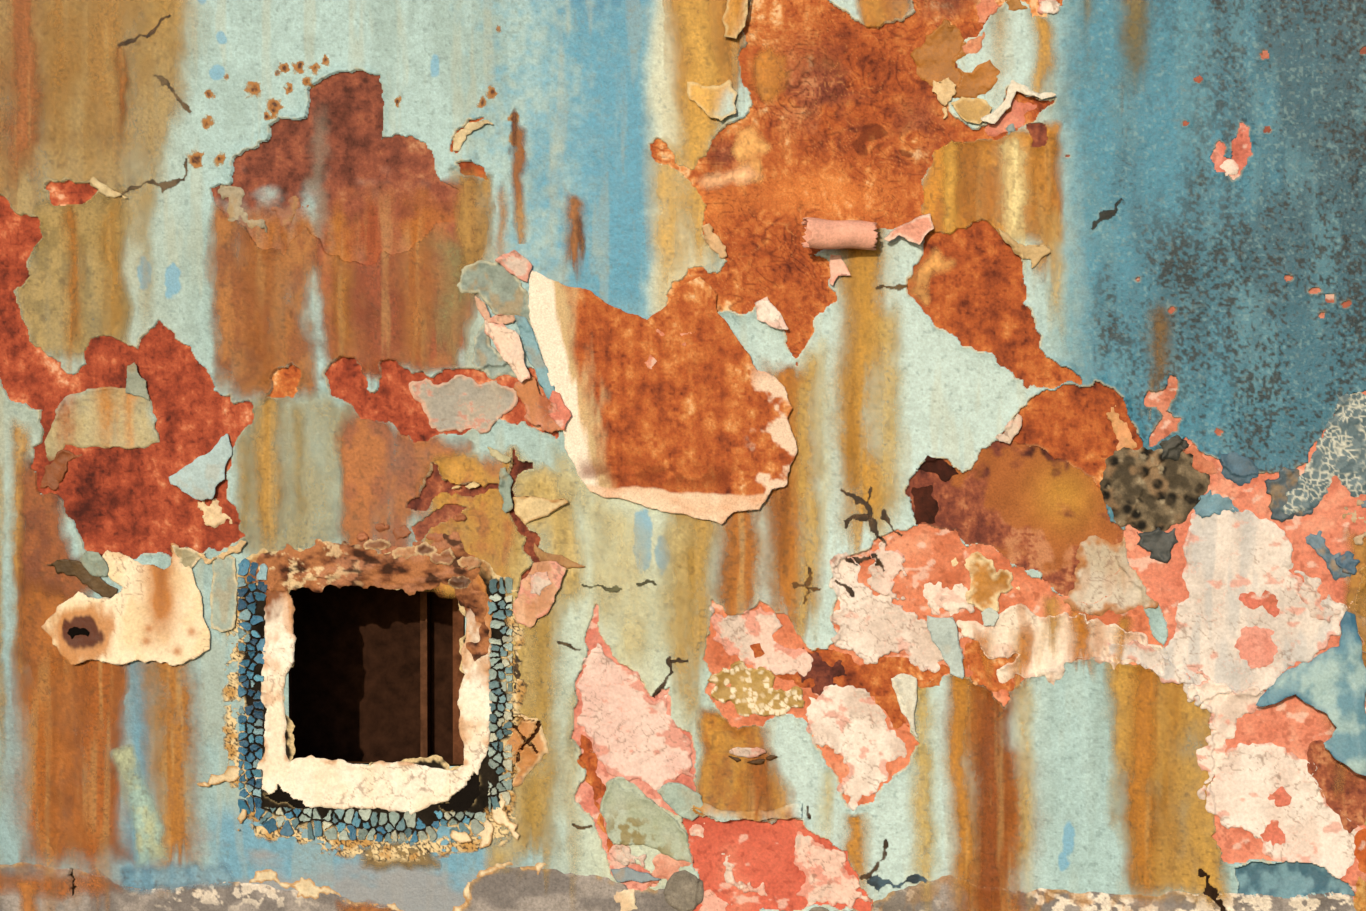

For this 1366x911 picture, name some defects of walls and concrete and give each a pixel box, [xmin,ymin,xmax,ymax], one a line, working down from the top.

crack [118,14,171,47]
crack [122,158,188,195]
crack [154,74,191,113]
corrosion [0,0,580,911]
peeling [450,117,532,380]
peeling [571,604,873,911]
crack [792,487,903,604]
corrosion [650,0,1145,822]
corrosion [949,675,1030,911]
peeling [703,375,1366,911]
corrosion [1109,663,1225,902]
spalling [1308,288,1352,318]